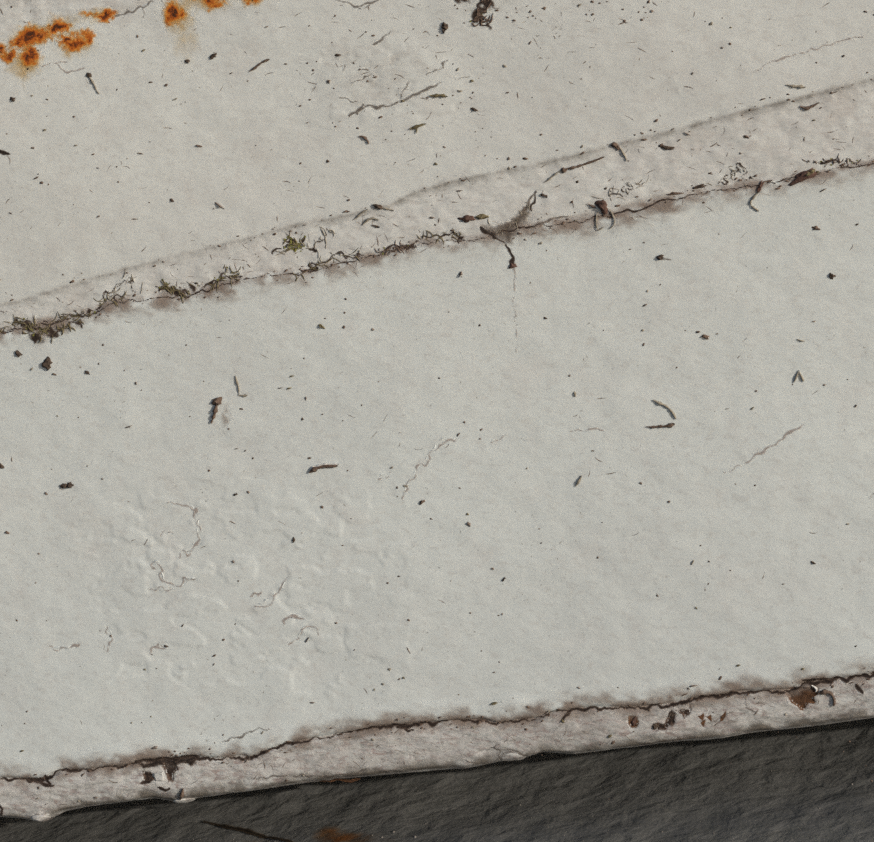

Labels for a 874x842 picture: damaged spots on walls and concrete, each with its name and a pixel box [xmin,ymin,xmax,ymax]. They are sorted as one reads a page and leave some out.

corrosion [83,8,116,23]
corrosion [164,0,225,26]
corrosion [0,19,96,75]
crack [2,177,795,332]
peeling [786,685,836,711]
peeling [628,716,639,728]
peeling [652,704,731,730]
peeling [135,755,200,792]